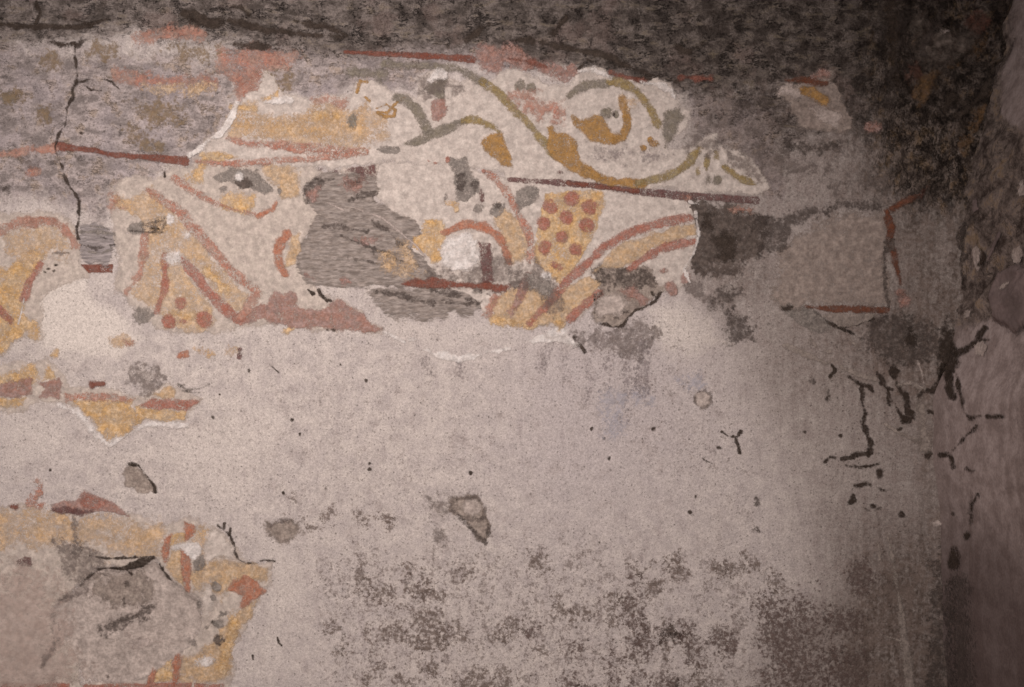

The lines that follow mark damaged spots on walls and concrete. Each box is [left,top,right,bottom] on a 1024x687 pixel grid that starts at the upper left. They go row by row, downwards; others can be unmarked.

crack [0,1,119,240]
spalling [591,265,665,327]
crack [810,308,874,334]
crack [824,364,915,517]
spalling [122,462,157,493]
crack [217,522,275,565]
spalling [427,494,491,545]
crack [81,555,171,585]
water stain [353,553,468,687]
water stain [489,548,876,687]
water stain [451,665,512,687]